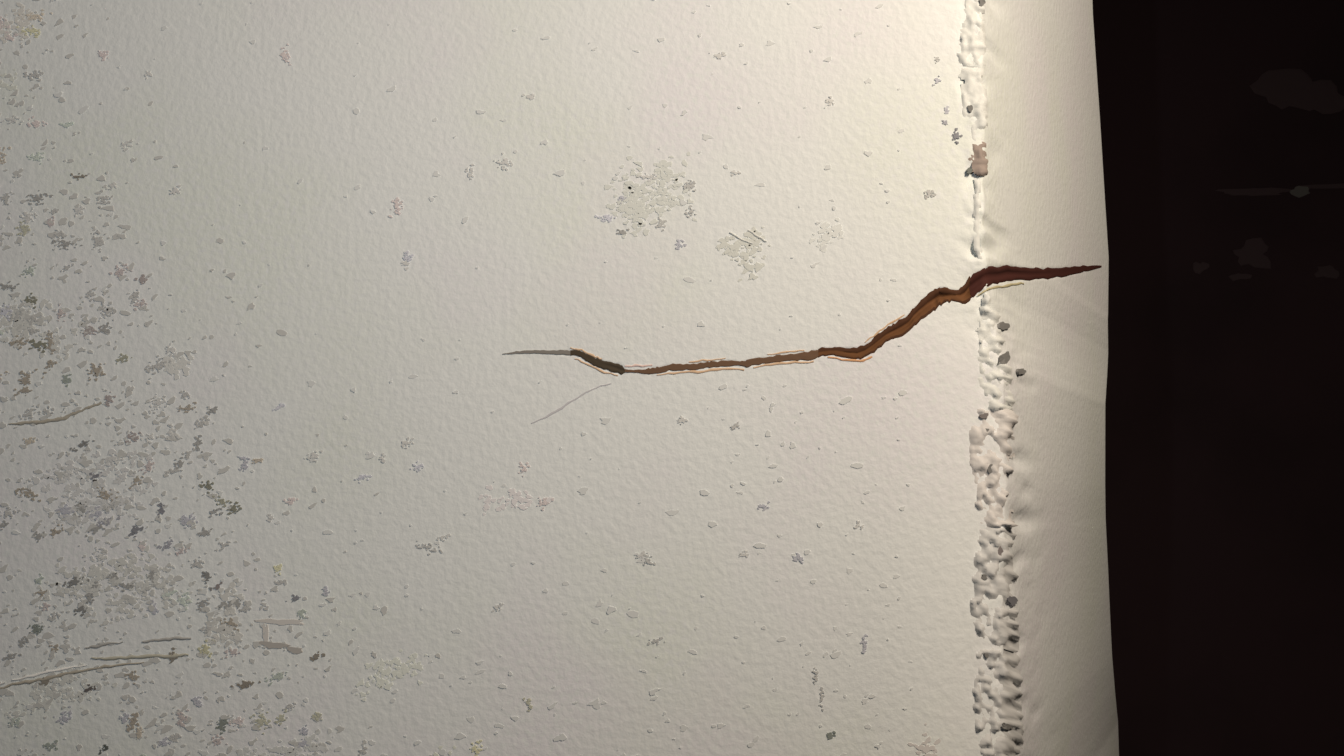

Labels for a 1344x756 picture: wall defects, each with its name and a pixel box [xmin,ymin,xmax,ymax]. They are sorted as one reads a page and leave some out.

crack [503,265,1102,424]